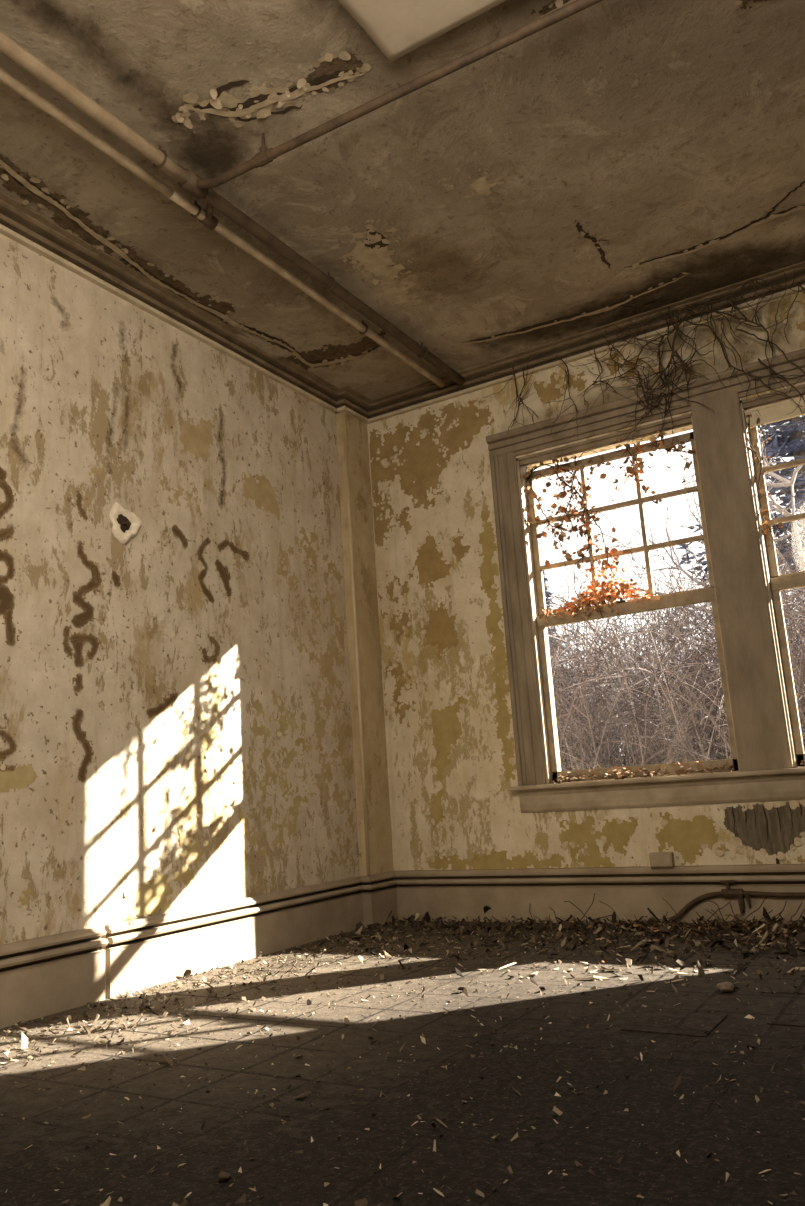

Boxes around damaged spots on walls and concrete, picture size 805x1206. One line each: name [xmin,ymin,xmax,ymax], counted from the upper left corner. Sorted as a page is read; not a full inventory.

crack [538,0,575,17]
peeling [172,51,363,133]
spalling [0,154,235,324]
peeling [336,219,425,318]
crack [461,181,805,345]
spalling [263,330,387,370]
spalling [109,502,142,545]
peeling [369,397,517,782]
peeling [0,764,38,793]
peeling [116,527,359,921]
peeling [384,661,468,831]
spalling [426,799,805,870]